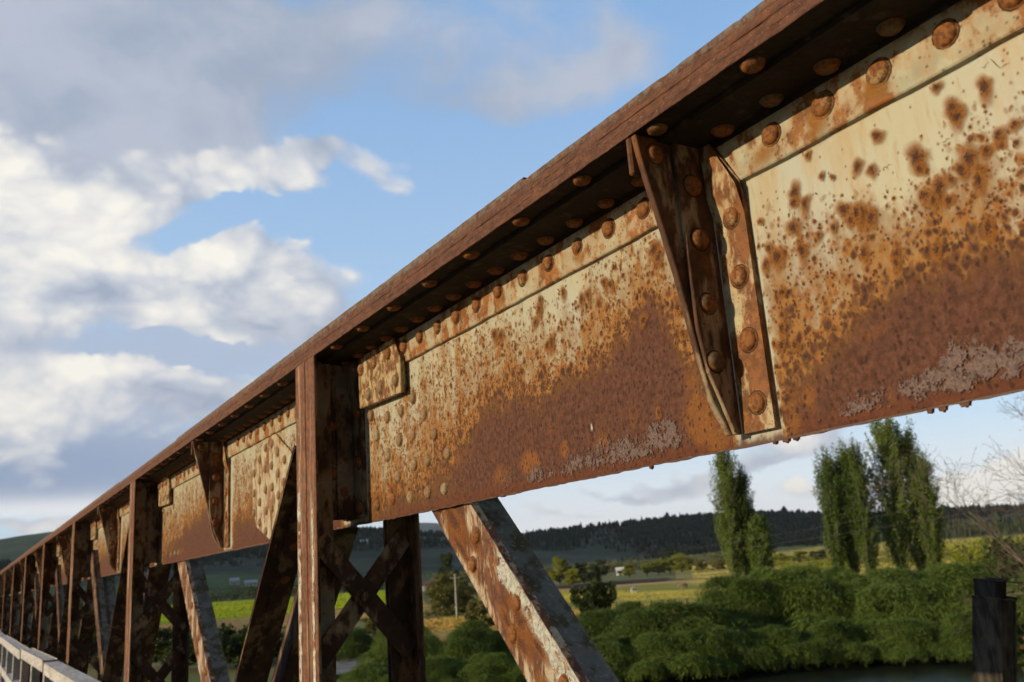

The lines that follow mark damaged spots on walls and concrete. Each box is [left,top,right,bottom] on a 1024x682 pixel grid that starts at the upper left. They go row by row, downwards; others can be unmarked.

corrosion [757,76,1024,445]
corrosion [144,442,270,567]
corrosion [365,233,737,578]
peeling [527,414,686,483]
peeling [817,323,1024,421]
corrosion [500,598,547,663]